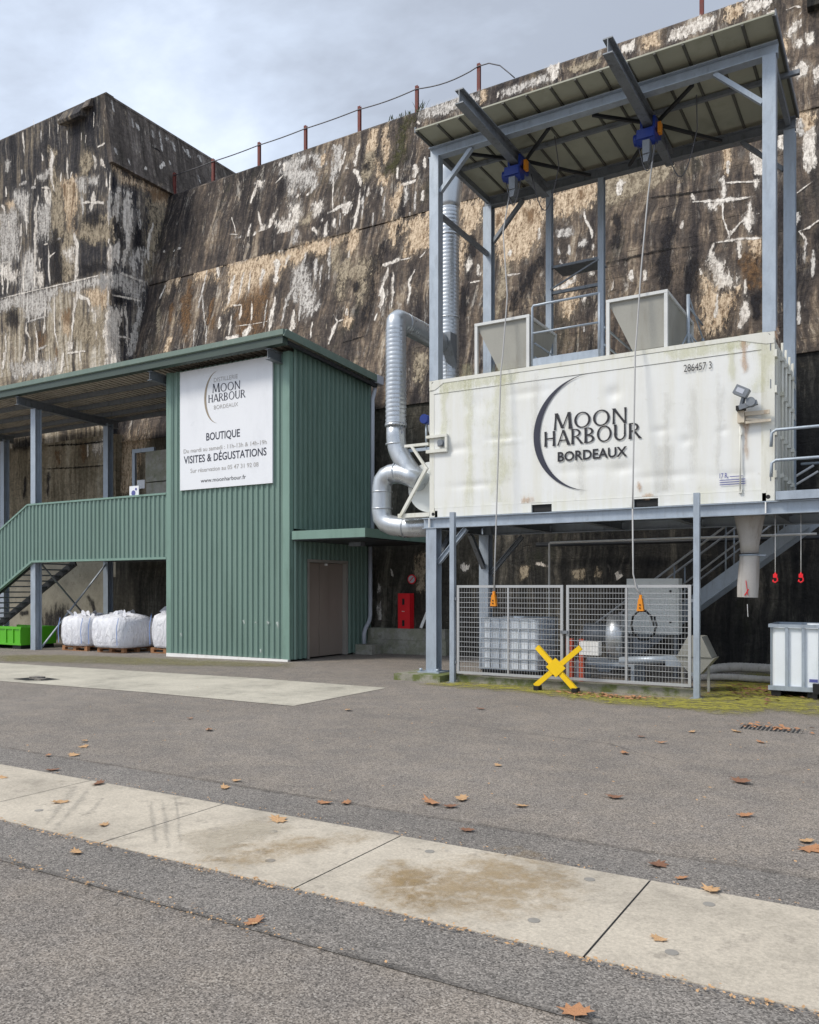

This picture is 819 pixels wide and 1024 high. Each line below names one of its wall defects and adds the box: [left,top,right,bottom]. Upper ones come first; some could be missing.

leakage [144,131,202,170]
leakage [235,144,426,238]
leakage [0,119,165,380]
leakage [193,236,333,346]
leakage [360,239,399,333]